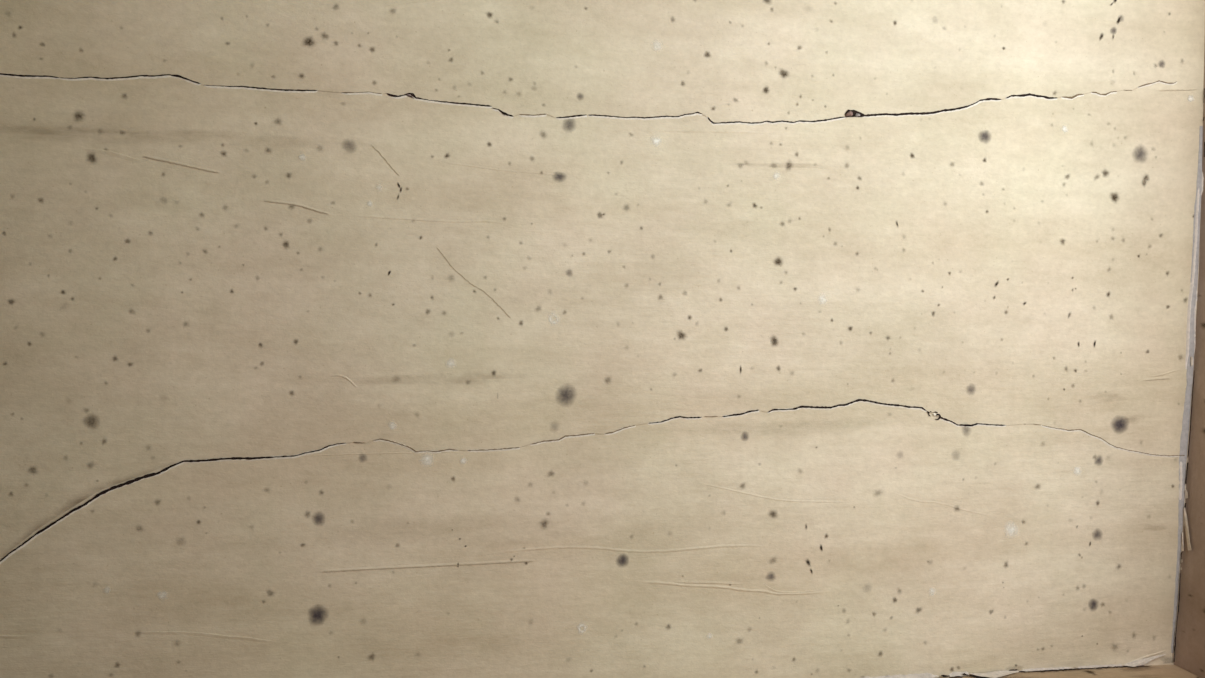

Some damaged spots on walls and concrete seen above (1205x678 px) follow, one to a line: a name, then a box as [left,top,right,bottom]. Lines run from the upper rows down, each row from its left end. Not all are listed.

crack [0,73,1205,157]
crack [0,375,1194,564]